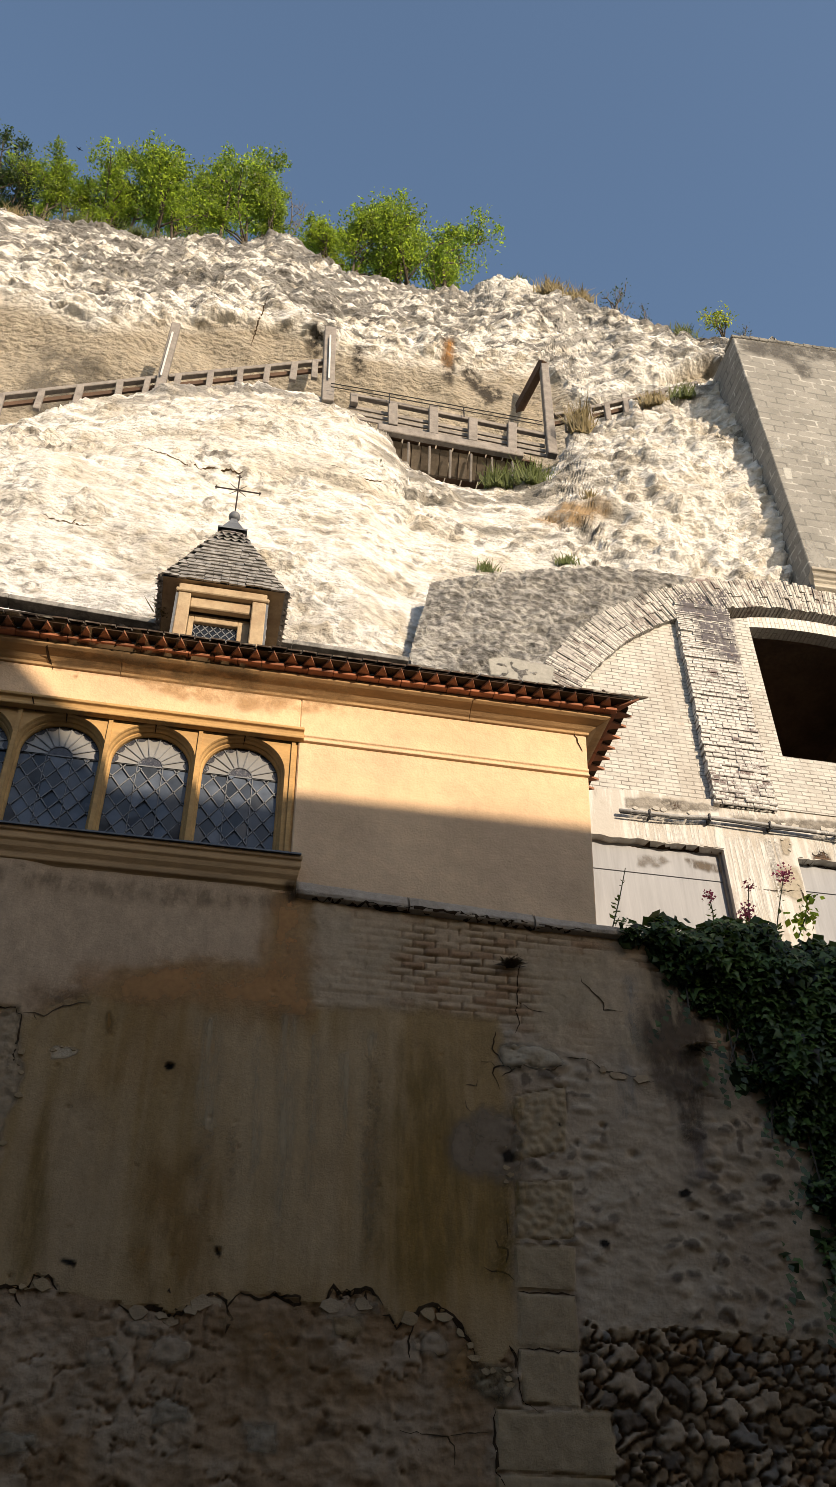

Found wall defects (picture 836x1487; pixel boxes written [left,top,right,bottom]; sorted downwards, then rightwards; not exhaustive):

spalling [0,1008,25,1146]
crack [0,1002,85,1066]
leakage [629,982,707,1174]
leakage [436,1109,524,1273]
flaking render [148,1336,191,1364]